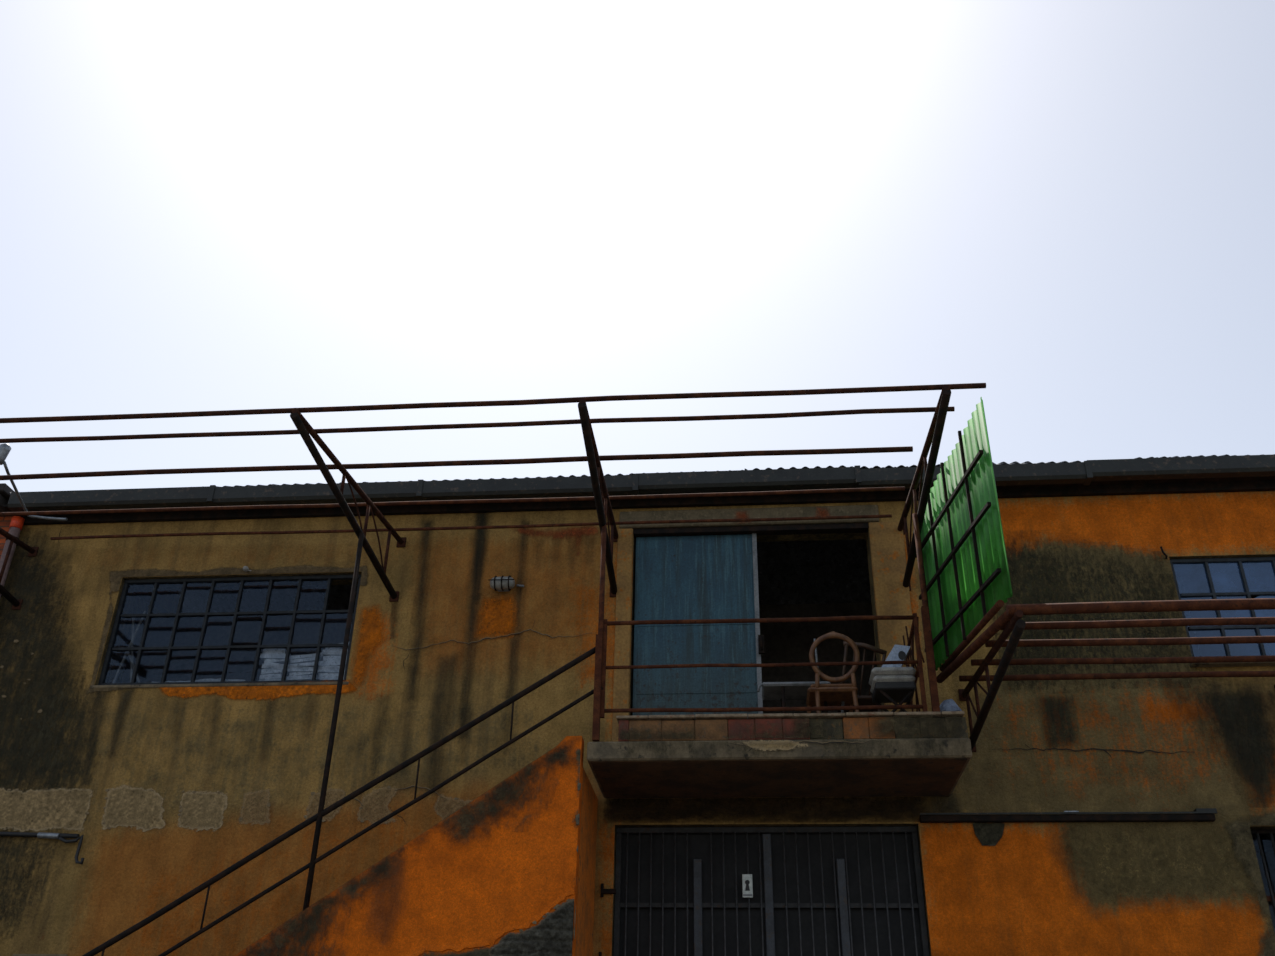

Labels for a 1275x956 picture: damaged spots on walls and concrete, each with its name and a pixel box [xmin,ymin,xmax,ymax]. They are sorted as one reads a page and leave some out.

leakage [0,545,106,790]
peeling [160,607,383,700]
leakage [461,513,485,727]
crack [391,621,597,669]
leakage [1006,540,1190,743]
leakage [1198,686,1275,799]
peeling [0,785,228,833]
peeling [304,789,345,822]
peeling [358,785,397,824]
spalling [403,888,576,956]